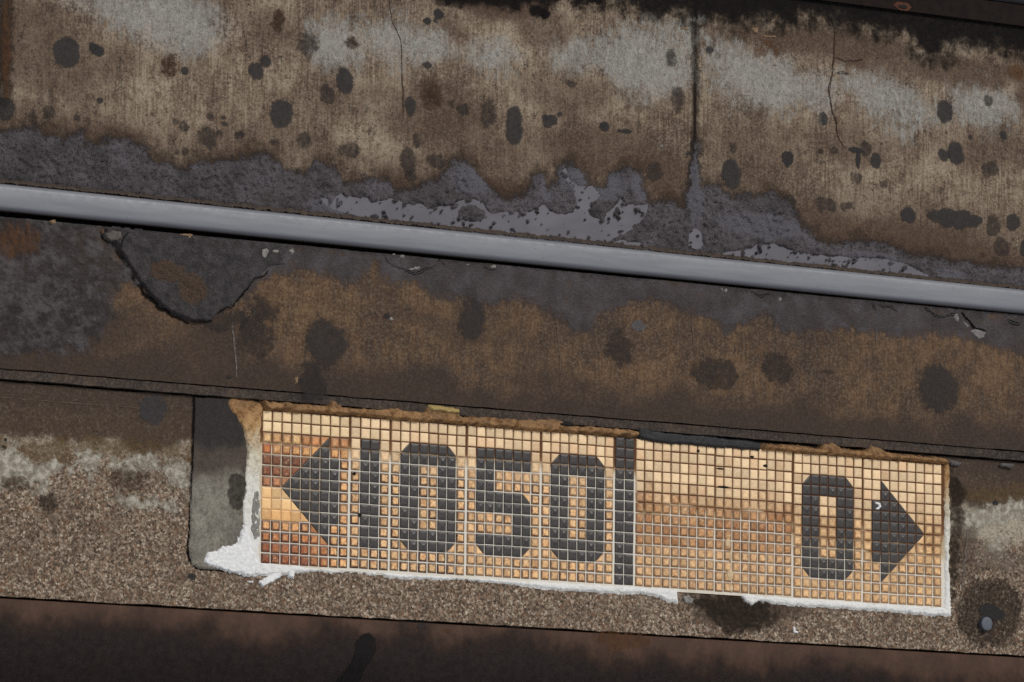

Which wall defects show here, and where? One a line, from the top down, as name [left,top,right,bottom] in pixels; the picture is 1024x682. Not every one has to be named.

leakage [97,0,214,76]
leakage [305,14,447,71]
crack [389,0,404,117]
spalling [600,122,632,133]
leakage [553,21,829,115]
crack [828,29,863,147]
leakage [836,66,939,142]
leakage [955,85,1018,131]
spalling [102,231,122,242]
leakage [0,441,191,512]
leakage [948,470,1024,645]